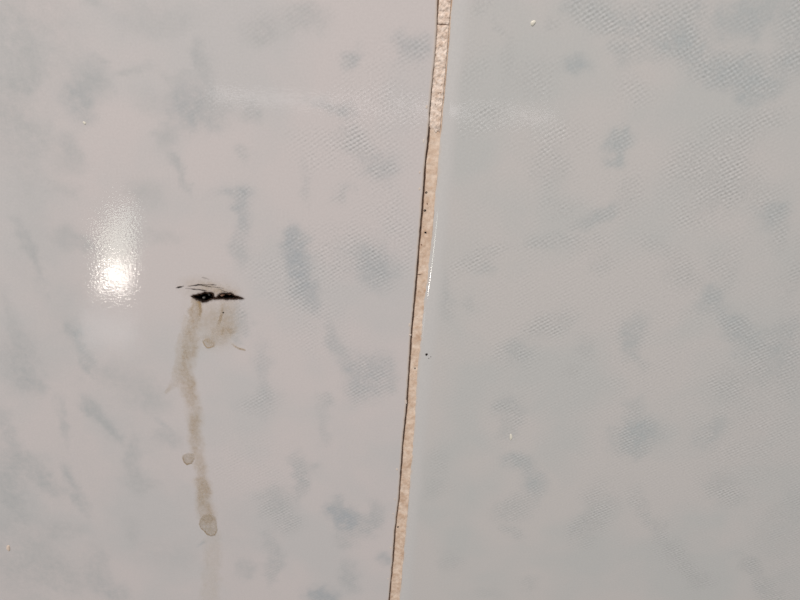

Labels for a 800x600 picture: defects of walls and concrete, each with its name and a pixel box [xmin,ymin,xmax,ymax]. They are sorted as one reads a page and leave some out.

spalling [193,292,240,302]